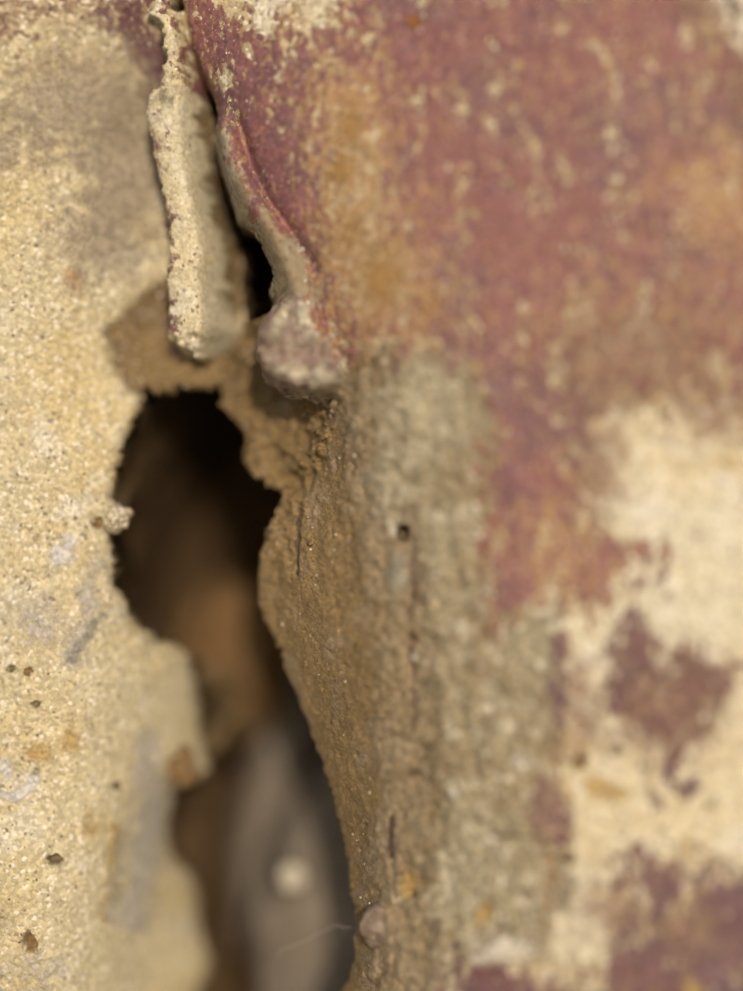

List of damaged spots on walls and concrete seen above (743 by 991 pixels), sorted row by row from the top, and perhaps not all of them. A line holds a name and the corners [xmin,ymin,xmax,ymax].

peeling [0,0,172,118]
crack [207,87,218,136]
crack [218,166,274,328]
spalling [91,129,401,991]
crack [294,507,302,575]
peeling [156,0,743,991]